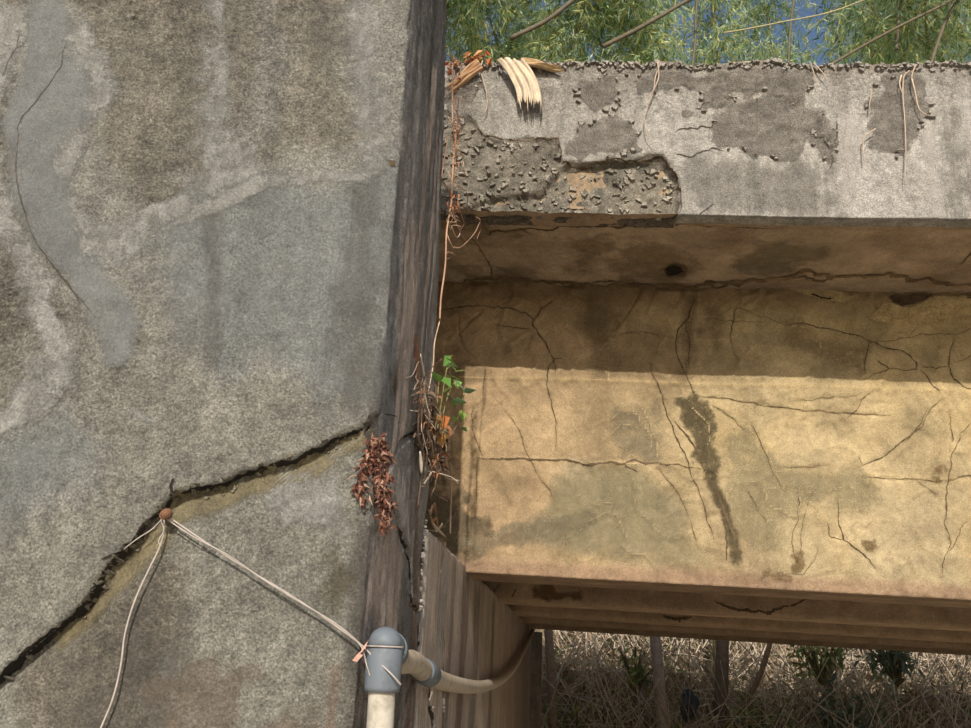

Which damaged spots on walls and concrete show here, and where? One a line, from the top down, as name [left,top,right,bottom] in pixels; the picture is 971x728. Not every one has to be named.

crack [15,42,93,315]
spalling [440,65,839,230]
crack [0,413,417,684]
crack [391,507,438,647]
crack [437,226,971,578]
water stain [676,391,742,563]
crack [427,632,445,728]